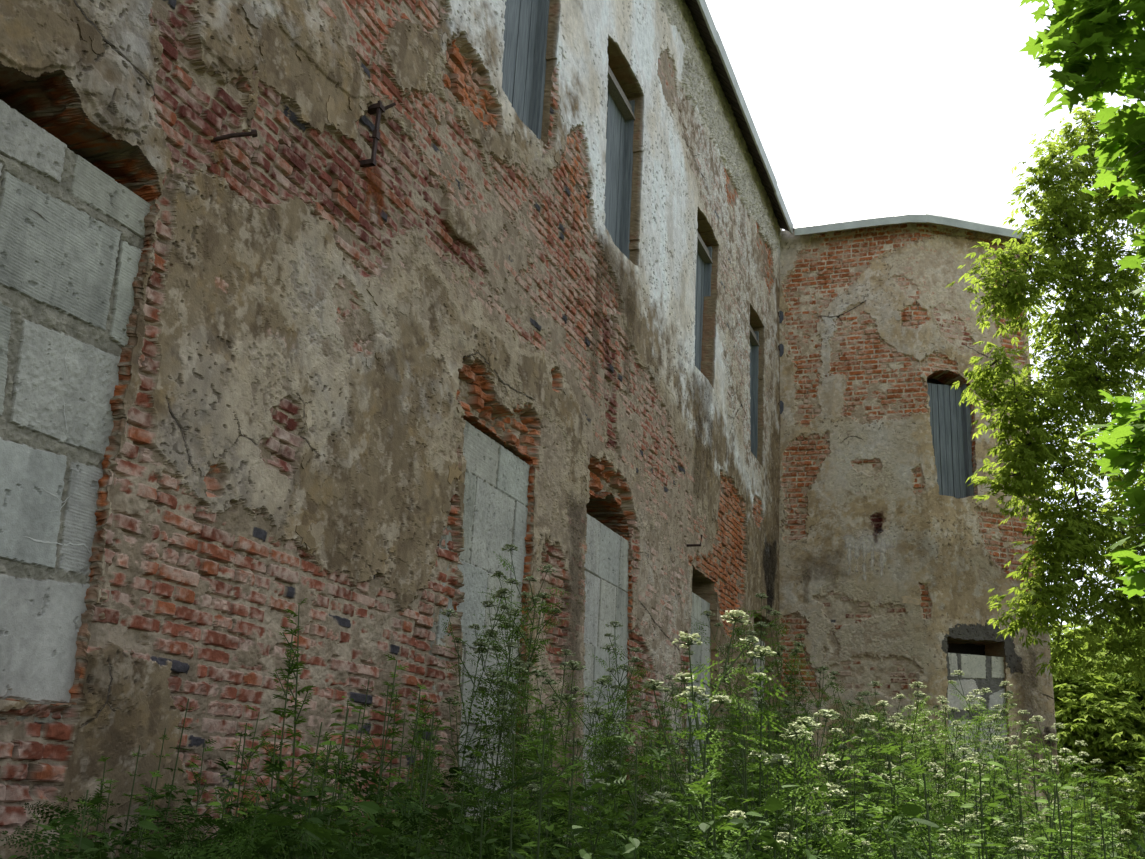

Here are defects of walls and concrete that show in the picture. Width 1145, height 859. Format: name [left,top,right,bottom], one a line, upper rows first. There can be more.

crack [74,0,155,101]
spalling [655,0,1028,545]
crack [167,400,193,470]
spalling [87,0,691,859]
spalling [688,469,766,644]